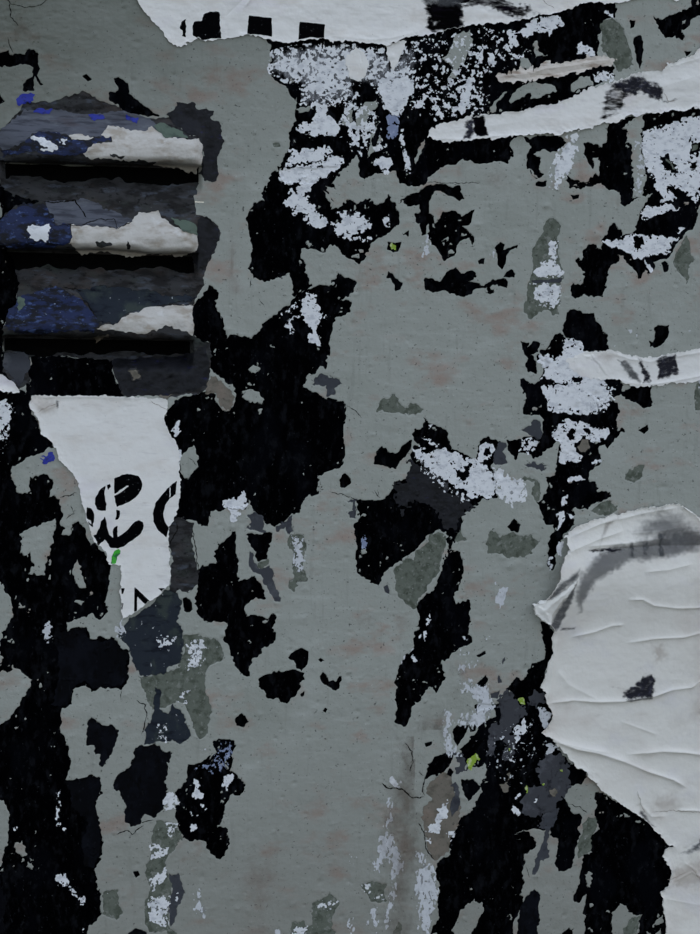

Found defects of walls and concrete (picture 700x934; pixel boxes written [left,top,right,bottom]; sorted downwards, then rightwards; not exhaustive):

peeling [653,0,700,40]
peeling [0,49,43,92]
peeling [633,35,644,68]
peeling [27,224,51,242]
peeling [398,184,474,261]
peeling [524,107,700,299]
peeling [348,218,653,727]
peeling [258,648,308,703]
peeling [319,658,342,691]
peeling [86,717,119,767]
peeling [113,634,224,827]
peeling [128,739,245,934]